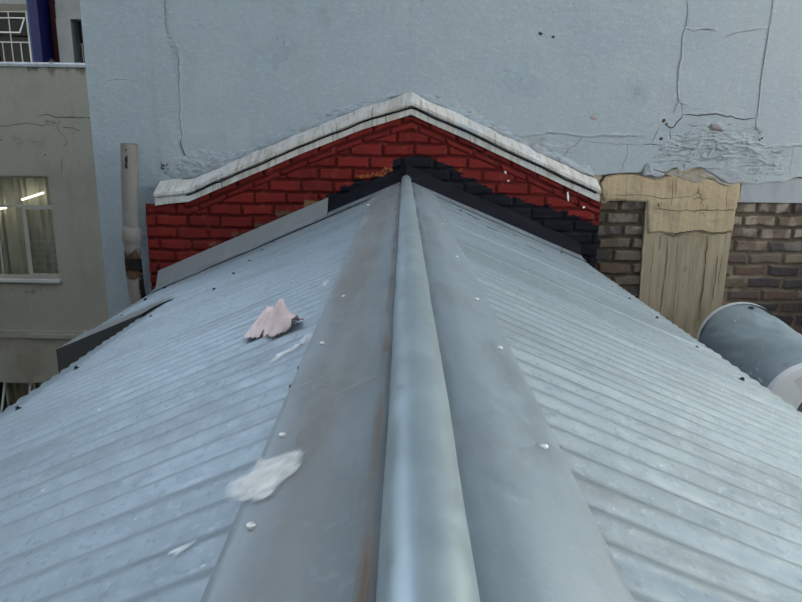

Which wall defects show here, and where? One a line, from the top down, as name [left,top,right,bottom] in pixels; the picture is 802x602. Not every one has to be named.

crack [0,114,90,173]
corrosion [124,250,146,298]
crack [164,0,185,157]
flaking render [594,175,646,298]
crack [611,188,735,316]
crack [562,0,802,178]
spalling [642,163,745,186]
flaking render [722,202,802,335]